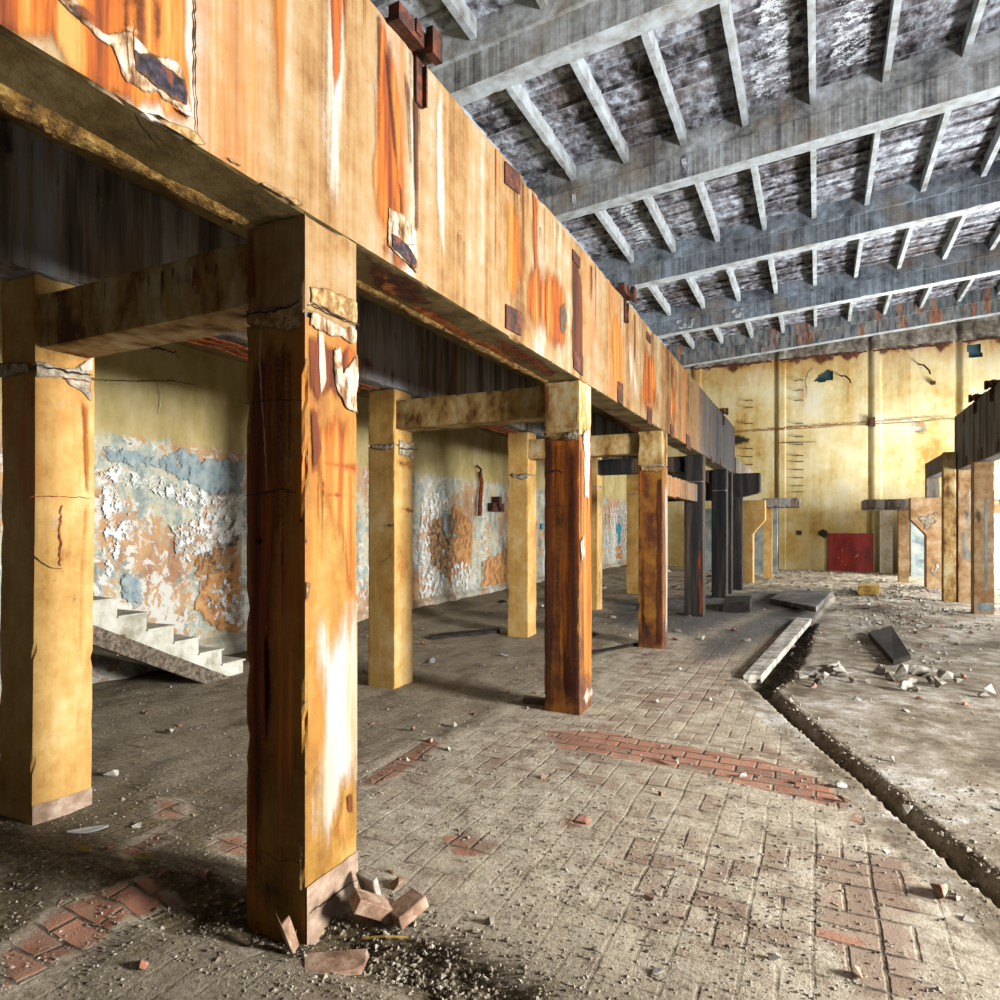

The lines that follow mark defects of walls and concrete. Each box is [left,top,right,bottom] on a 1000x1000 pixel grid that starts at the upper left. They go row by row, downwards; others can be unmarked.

spalling [60,0,206,145]
rust [373,16,420,229]
spalling [0,358,93,401]
peeling [98,443,245,633]
rust [247,331,292,881]
spalling [242,286,379,413]
rust [309,333,358,589]
spalling [388,207,418,273]
rust [496,148,592,361]
rust [544,441,592,700]
hole [814,370,833,383]
rust [694,337,1000,373]